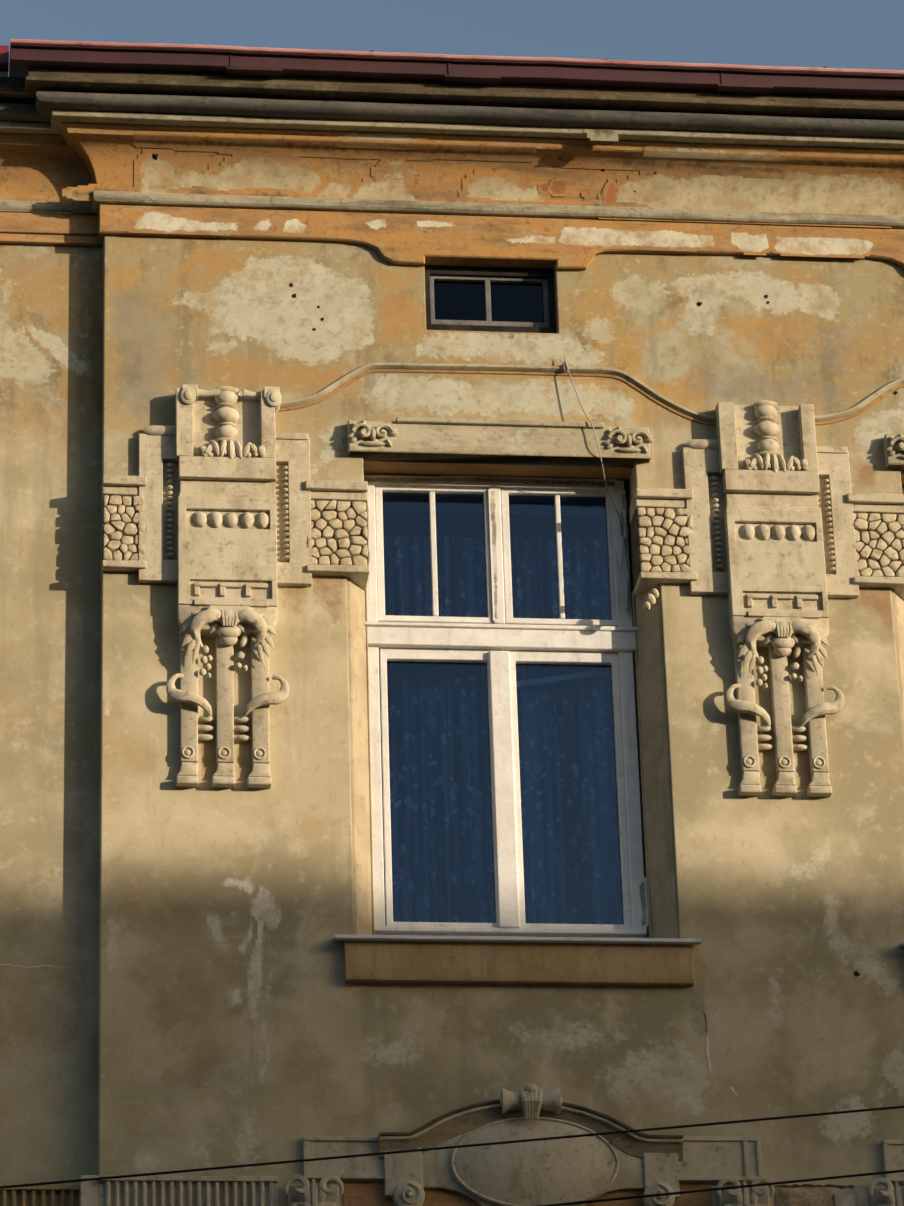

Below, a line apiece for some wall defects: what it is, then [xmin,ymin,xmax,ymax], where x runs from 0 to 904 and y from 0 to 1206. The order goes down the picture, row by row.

peeling [0,263,93,397]
peeling [128,131,428,371]
peeling [310,141,904,480]
water stain [0,939,99,1081]
water stain [114,828,285,1121]